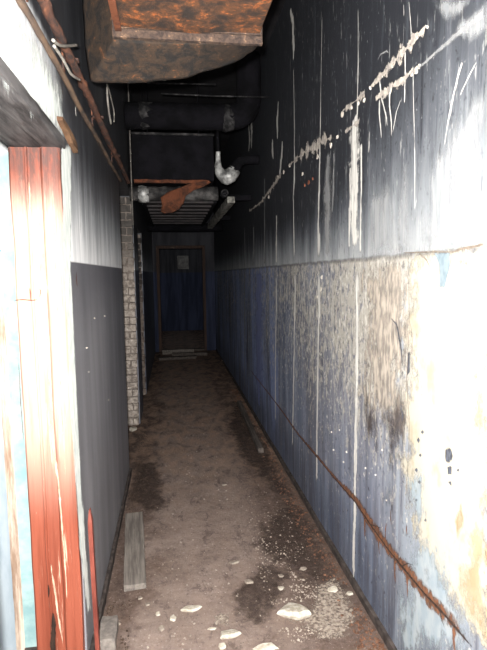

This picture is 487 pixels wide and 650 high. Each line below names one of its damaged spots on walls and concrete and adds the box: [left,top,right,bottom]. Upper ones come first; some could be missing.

water stain [272,109,283,175]
water stain [317,149,334,255]
water stain [348,52,362,251]
water stain [371,192,407,252]
water stain [379,81,405,135]
water stain [428,109,479,244]
water stain [366,407,375,435]
water stain [387,394,405,462]
corrosion [252,372,459,650]